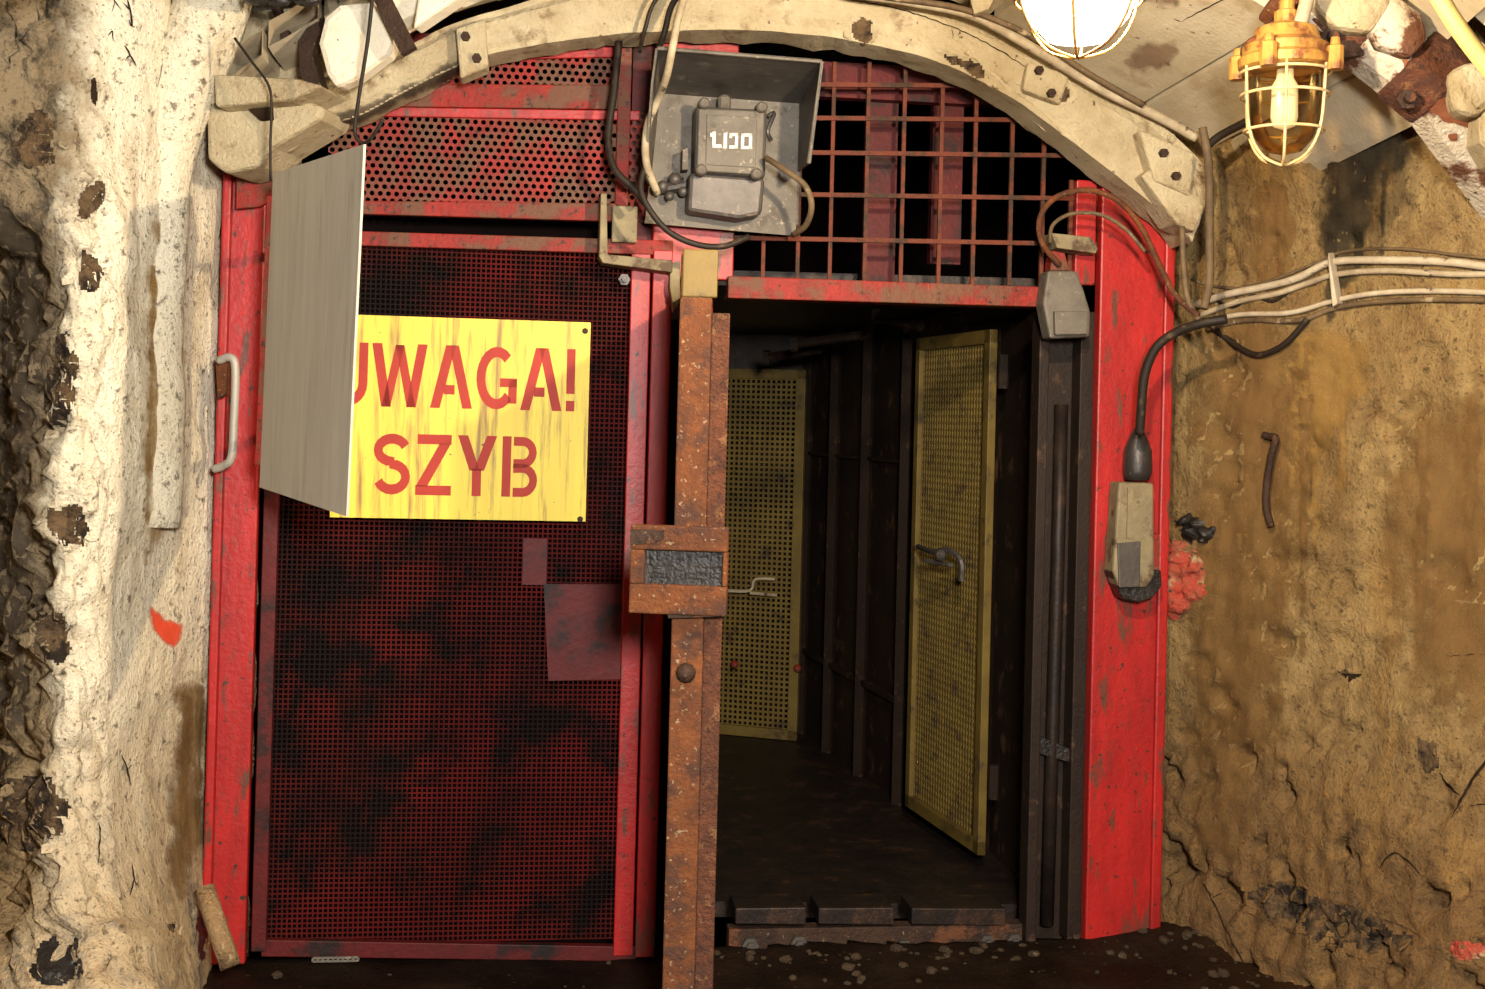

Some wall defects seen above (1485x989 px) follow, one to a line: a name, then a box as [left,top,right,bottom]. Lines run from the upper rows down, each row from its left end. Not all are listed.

crack [1439,761,1485,817]